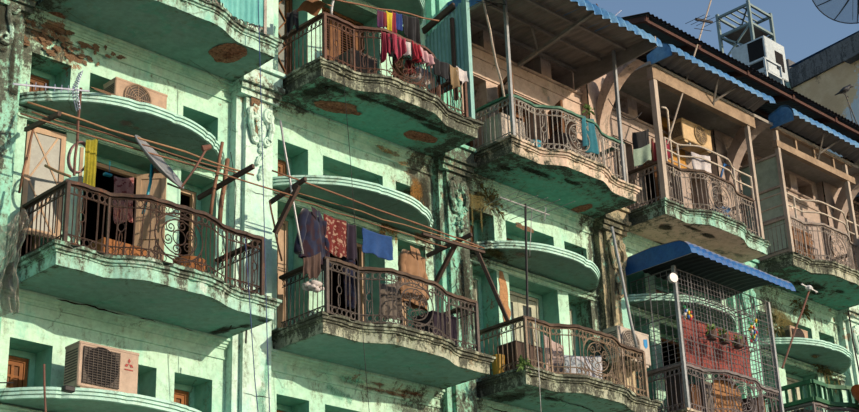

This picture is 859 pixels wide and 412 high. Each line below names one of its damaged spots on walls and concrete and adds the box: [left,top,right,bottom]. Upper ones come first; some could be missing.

water stain [0,4,20,94]
peeling [24,12,126,66]
spalling [208,43,248,63]
spalling [314,101,361,116]
spalling [403,130,438,143]
water stain [420,178,430,209]
crack [58,299,118,314]
water stain [456,248,475,347]